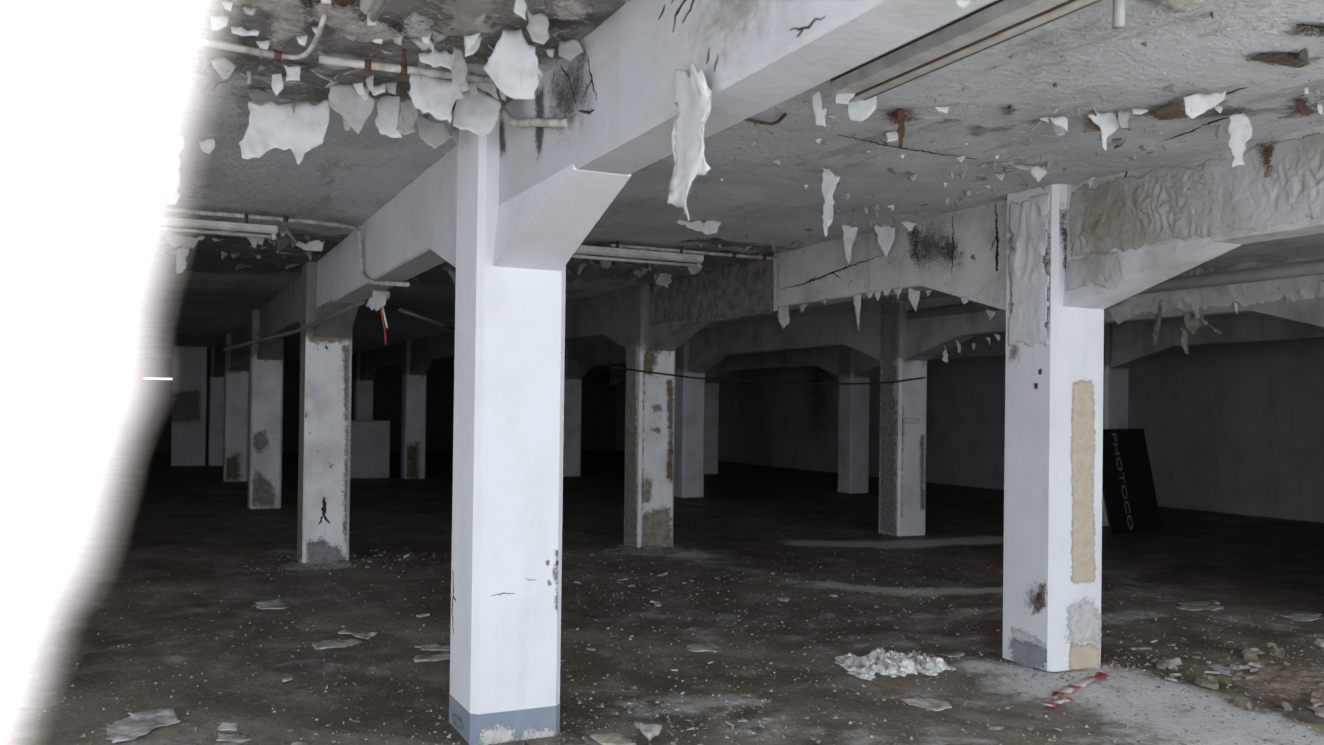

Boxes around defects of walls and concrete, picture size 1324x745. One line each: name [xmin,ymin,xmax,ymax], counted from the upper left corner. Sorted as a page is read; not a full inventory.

crack [658,0,695,31]
crack [790,16,826,38]
peeling [183,0,596,165]
leakage [535,53,589,153]
rust [881,108,919,148]
spalling [566,22,1324,328]
spalling [624,337,674,547]
spalling [1066,380,1102,670]
peeling [1009,627,1047,679]